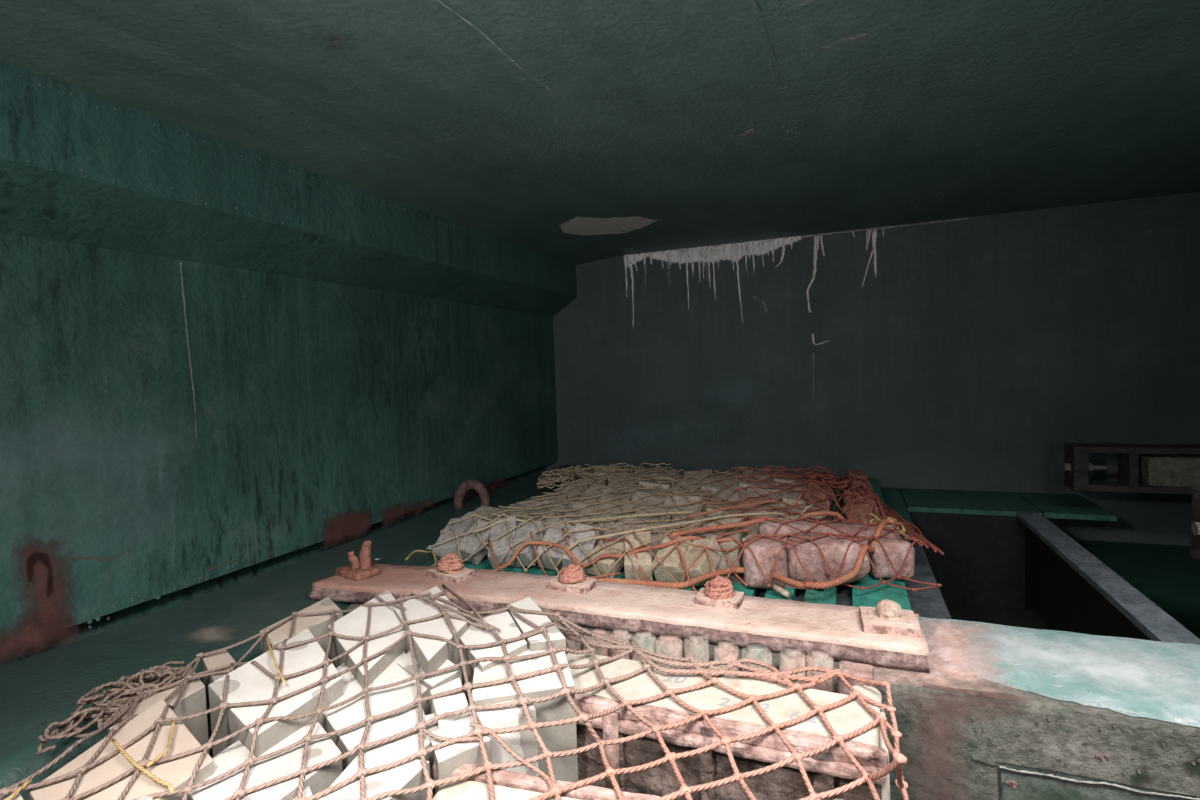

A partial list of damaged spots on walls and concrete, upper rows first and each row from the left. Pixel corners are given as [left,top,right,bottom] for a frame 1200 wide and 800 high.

efflorescence [624,235,825,325]
rust [324,500,433,546]
rust [0,544,70,661]